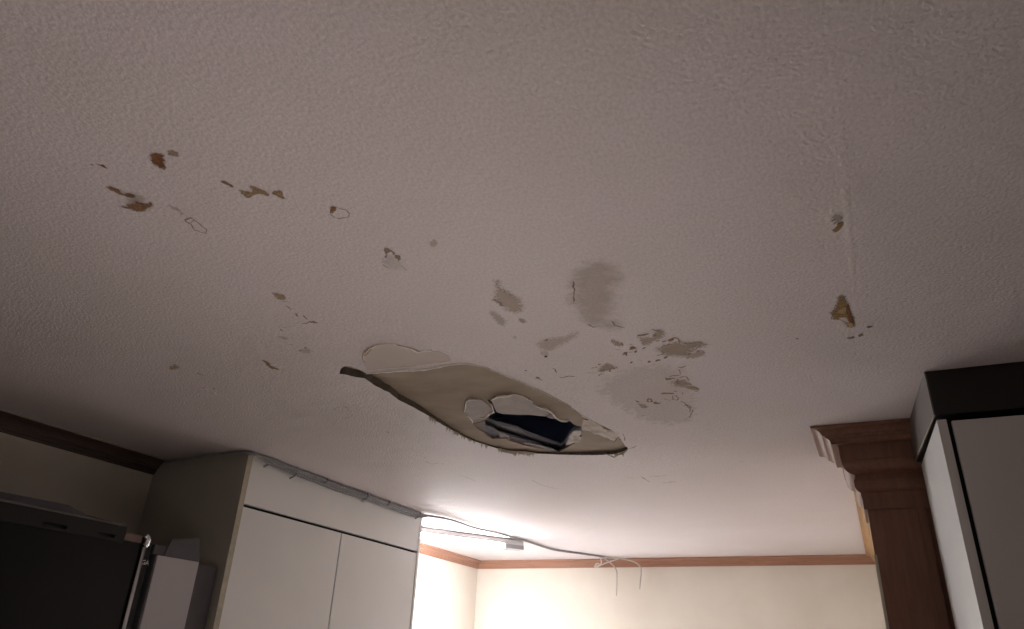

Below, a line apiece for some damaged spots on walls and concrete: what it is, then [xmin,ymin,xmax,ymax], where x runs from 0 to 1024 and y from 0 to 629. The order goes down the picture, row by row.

spalling [831,295,854,328]
peeling [611,329,705,418]
peeling [465,395,549,420]